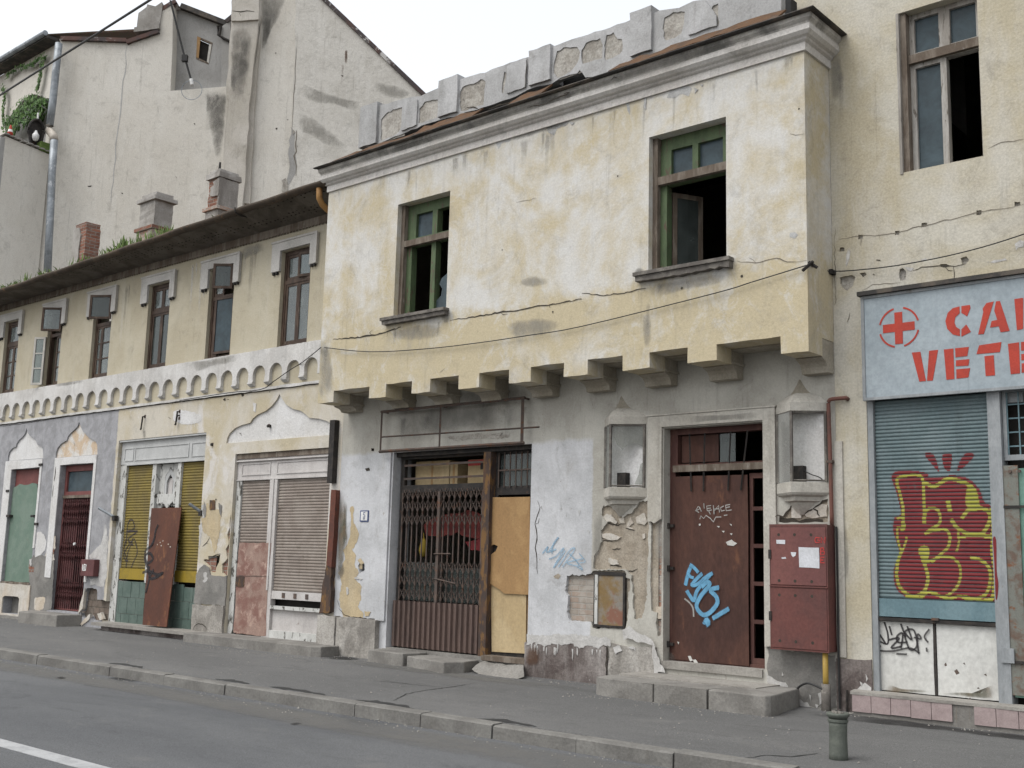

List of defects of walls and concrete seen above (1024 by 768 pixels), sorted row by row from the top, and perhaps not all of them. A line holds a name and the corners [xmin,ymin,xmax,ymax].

spalling [663,12,685,40]
spalling [554,33,623,80]
spalling [460,79,486,113]
peeling [667,84,703,98]
spalling [381,108,405,141]
crack [834,204,1023,322]
crack [454,288,645,320]
crack [337,327,399,340]
spalling [780,499,829,523]
peeling [199,502,230,582]
peeling [338,506,370,618]
spalling [527,501,665,673]